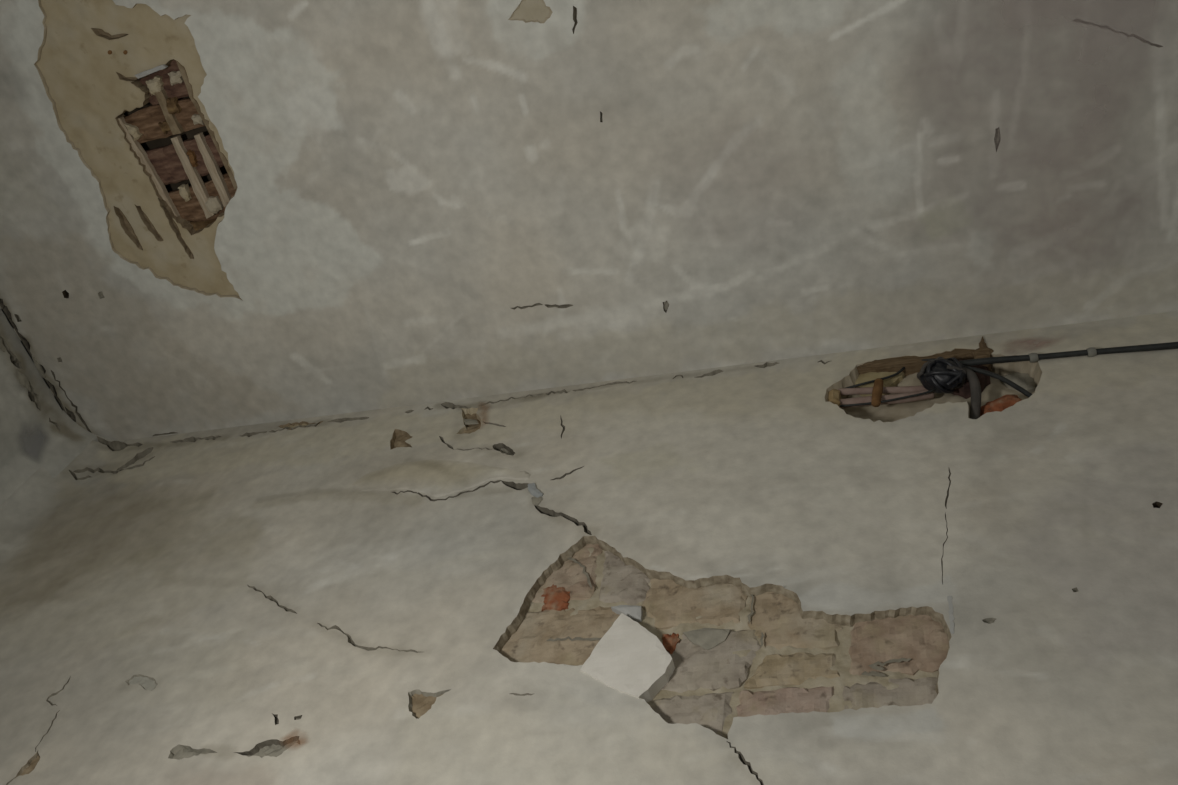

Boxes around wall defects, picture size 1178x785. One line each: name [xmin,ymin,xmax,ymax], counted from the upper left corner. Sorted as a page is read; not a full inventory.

flaking render [508,0,553,23]
crack [571,6,579,34]
flaking render [34,0,242,300]
flaking render [825,348,1042,422]
flaking render [390,429,412,449]
crack [392,466,592,535]
crack [248,585,421,653]
flaking render [493,536,952,742]
flaking render [408,689,451,719]
flaking render [168,744,217,760]
flaking render [235,736,300,758]
crack [727,741,764,785]